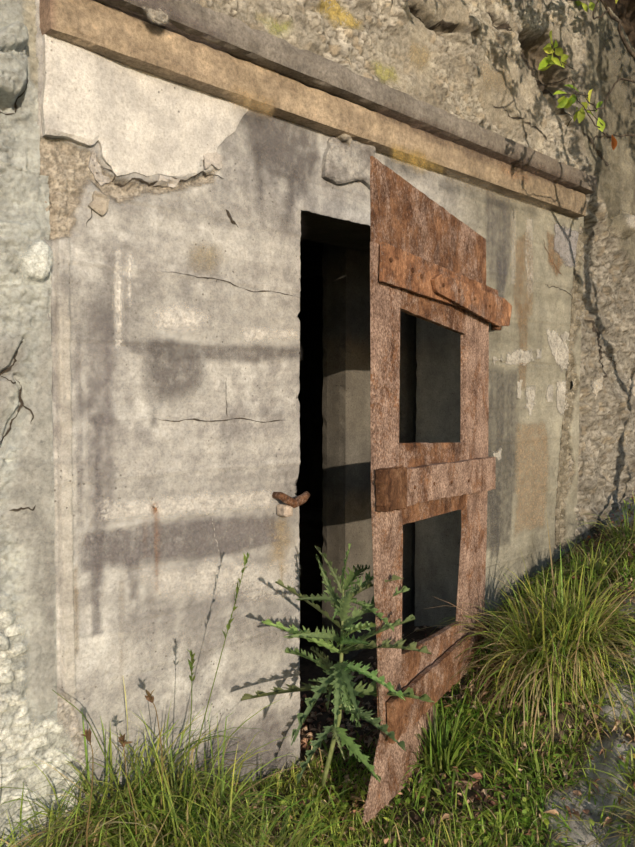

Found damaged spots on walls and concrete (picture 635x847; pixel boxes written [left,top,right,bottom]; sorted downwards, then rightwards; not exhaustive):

crack [392,0,459,33]
crack [487,12,512,31]
peeling [38,34,249,240]
crack [494,106,549,142]
crack [521,51,612,170]
crack [0,338,34,445]
spalling [492,223,588,550]
peeling [592,375,604,400]
crack [153,401,280,423]
leakage [84,493,277,576]
leakage [160,565,294,597]